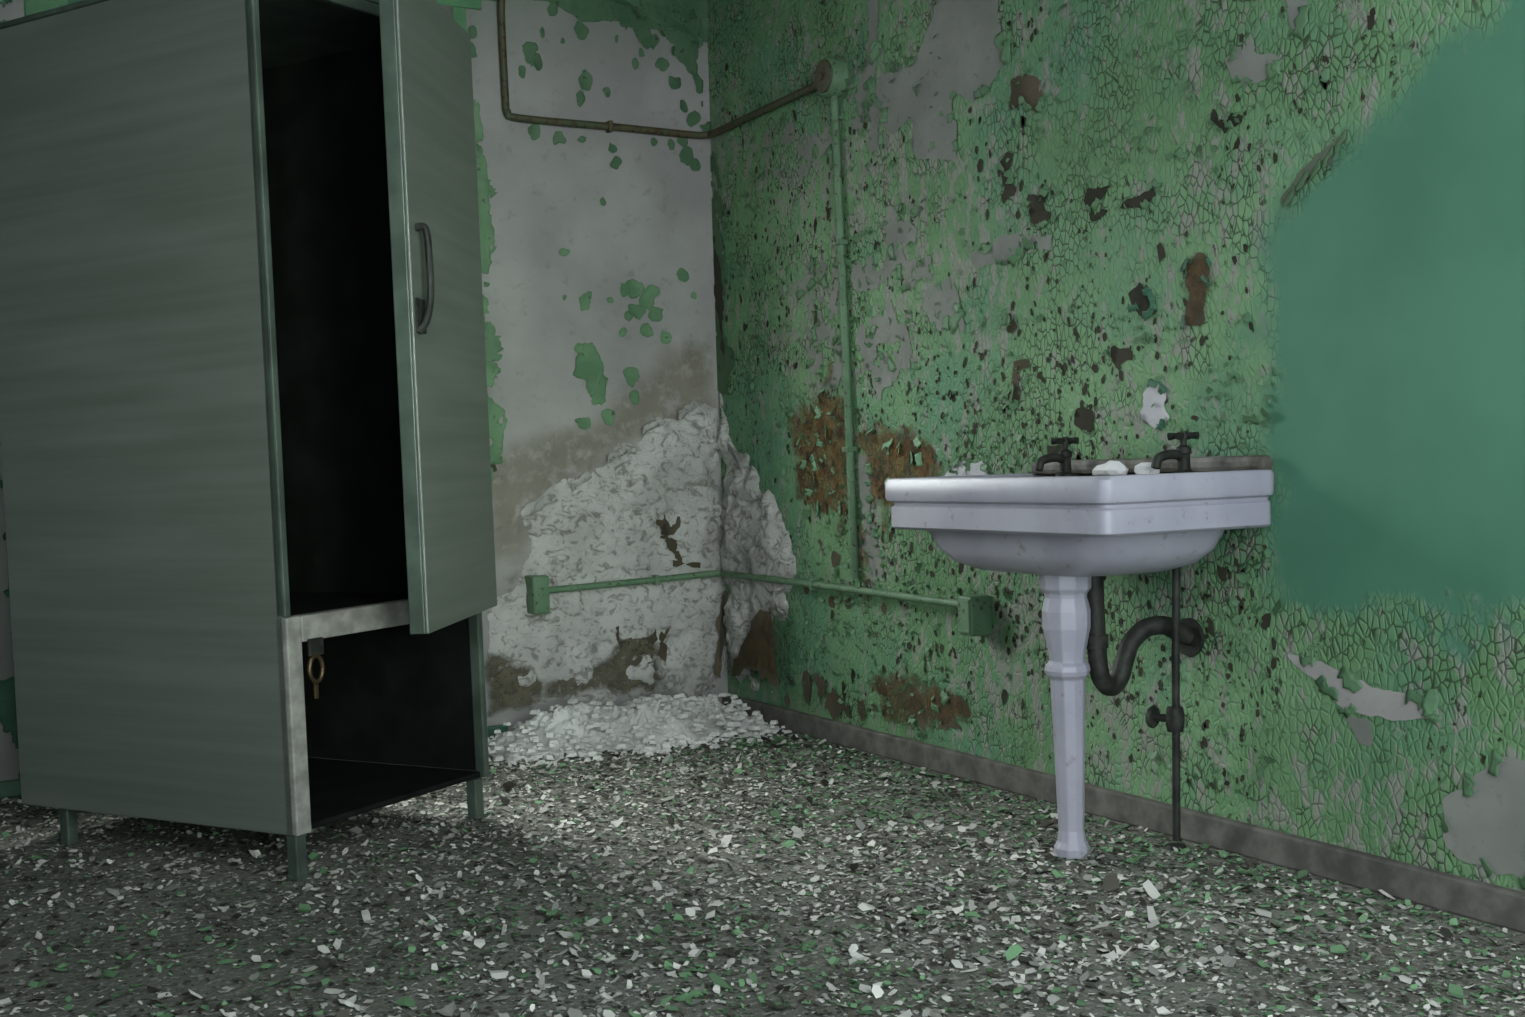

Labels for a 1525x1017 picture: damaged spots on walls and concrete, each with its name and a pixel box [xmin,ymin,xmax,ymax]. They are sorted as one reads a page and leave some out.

spalling [1367,7,1378,33]
peeling [473,99,508,472]
peeling [0,676,19,749]
leakage [486,626,661,716]
peeling [1114,528,1442,802]